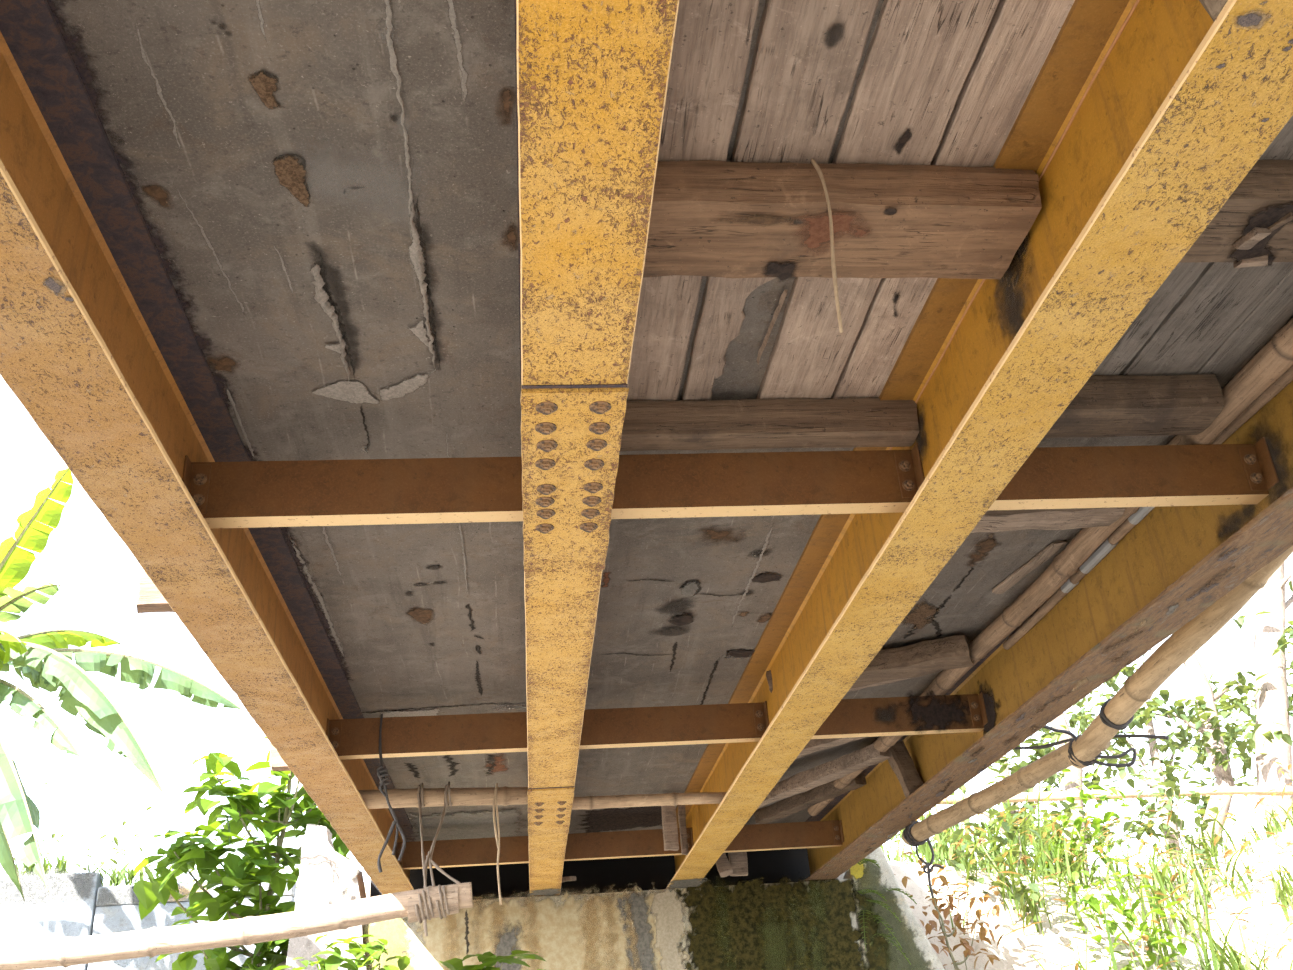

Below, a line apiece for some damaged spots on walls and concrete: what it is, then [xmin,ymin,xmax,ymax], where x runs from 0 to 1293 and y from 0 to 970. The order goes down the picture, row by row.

spalling [248,71,281,109]
crack [384,0,414,219]
spalling [273,154,310,207]